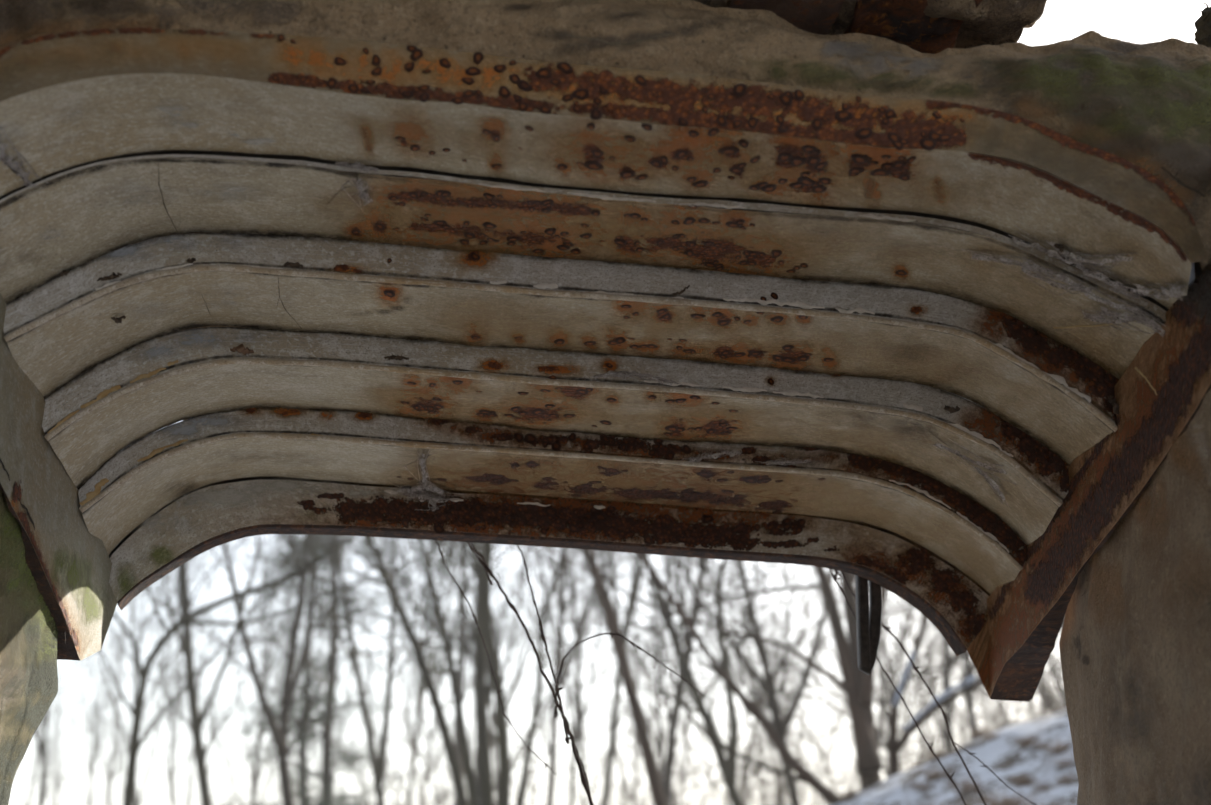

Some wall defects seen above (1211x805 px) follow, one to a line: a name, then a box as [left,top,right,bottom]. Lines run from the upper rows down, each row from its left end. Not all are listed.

corrosion [0,28,228,58]
corrosion [251,34,1195,262]
corrosion [334,264,363,273]
corrosion [344,178,809,277]
corrosion [246,408,305,417]
corrosion [294,270,1211,695]